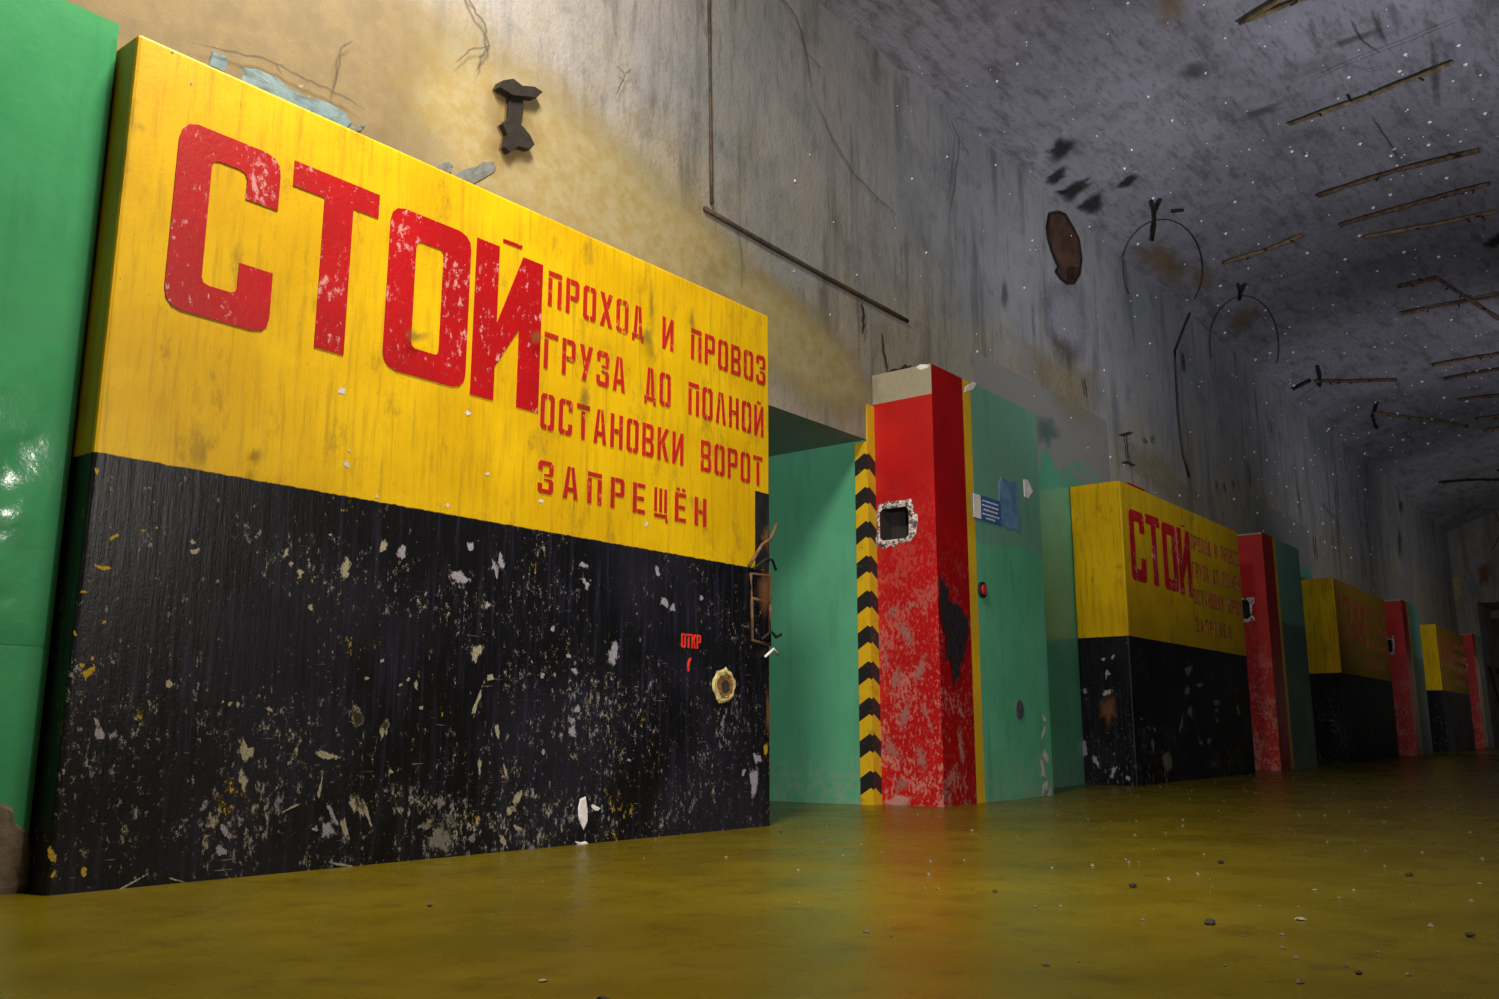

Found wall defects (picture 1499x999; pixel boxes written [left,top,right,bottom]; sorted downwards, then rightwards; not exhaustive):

crack [458,0,490,71]
peeling [340,556,351,578]
peeling [380,541,406,559]
peeling [450,570,471,583]
peeling [492,553,505,578]
peeling [472,645,494,714]
peeling [609,641,619,665]
peeling [237,739,254,792]
peeling [742,744,768,797]
peeling [312,777,372,838]
peeling [498,790,534,849]
peeling [575,796,600,845]